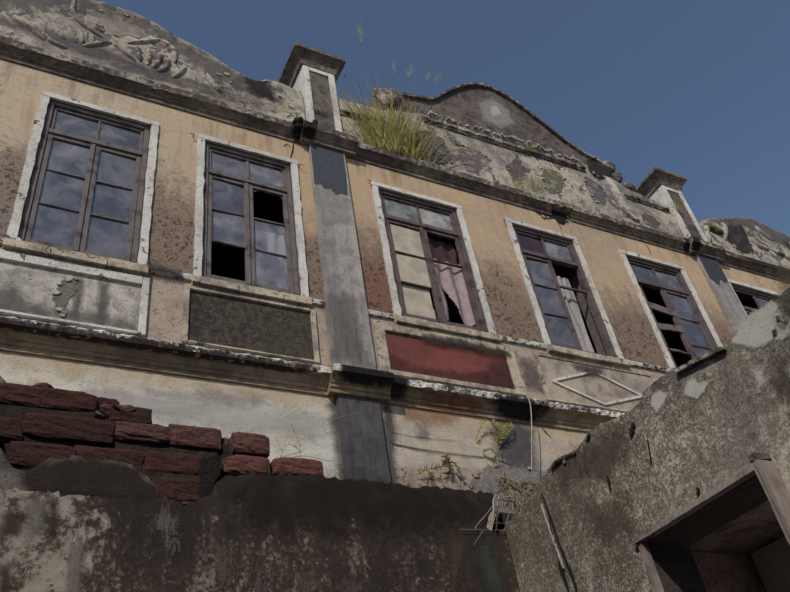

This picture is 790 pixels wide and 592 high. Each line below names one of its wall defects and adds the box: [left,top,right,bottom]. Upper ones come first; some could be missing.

peeling [310,144,347,195]
spalling [541,168,566,194]
spalling [584,159,612,206]
spalling [51,277,79,317]
peeling [731,300,790,349]
water stain [93,295,549,531]
crack [629,408,652,465]
peeling [651,390,668,413]
peeling [683,378,709,399]
water stain [0,511,22,534]
water stain [22,457,180,553]
crack [541,493,578,592]